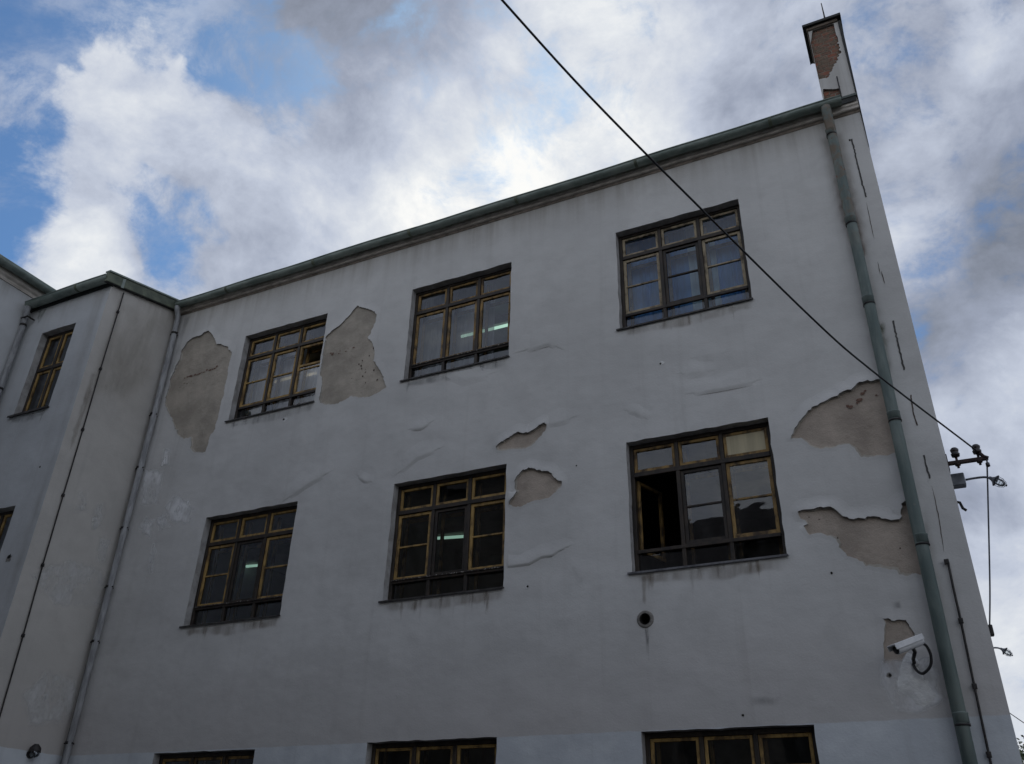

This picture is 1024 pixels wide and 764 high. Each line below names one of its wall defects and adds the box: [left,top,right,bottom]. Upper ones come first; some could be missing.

flaking render [811,23,841,99]
flaking render [163,325,236,455]
flaking render [317,300,389,407]
flaking render [784,369,900,461]
flaking render [491,415,568,510]
flaking render [789,490,926,580]
flaking render [872,606,921,678]